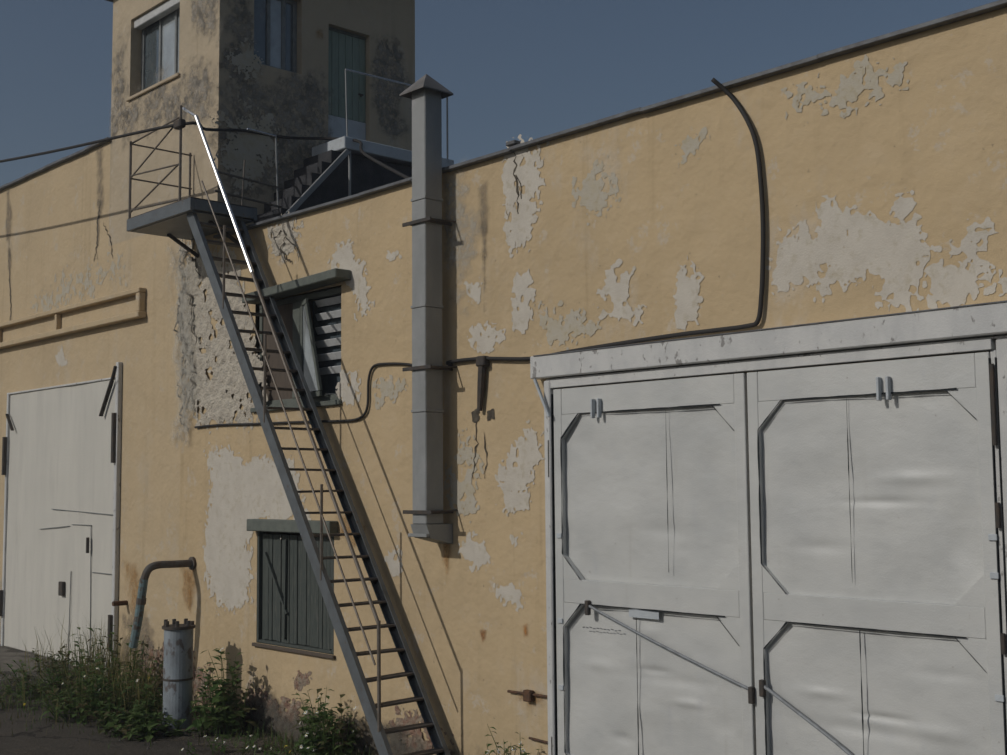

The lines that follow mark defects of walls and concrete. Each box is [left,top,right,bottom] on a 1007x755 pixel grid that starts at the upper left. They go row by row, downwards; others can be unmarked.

water stain [111,0,331,197]
peeling [781,54,910,119]
crack [513,153,522,214]
crack [94,203,113,259]
peeling [327,237,375,321]
peeling [673,256,704,338]
peeling [765,190,1007,312]
peeling [176,239,311,615]
crack [472,422,487,478]
peeling [444,409,544,573]